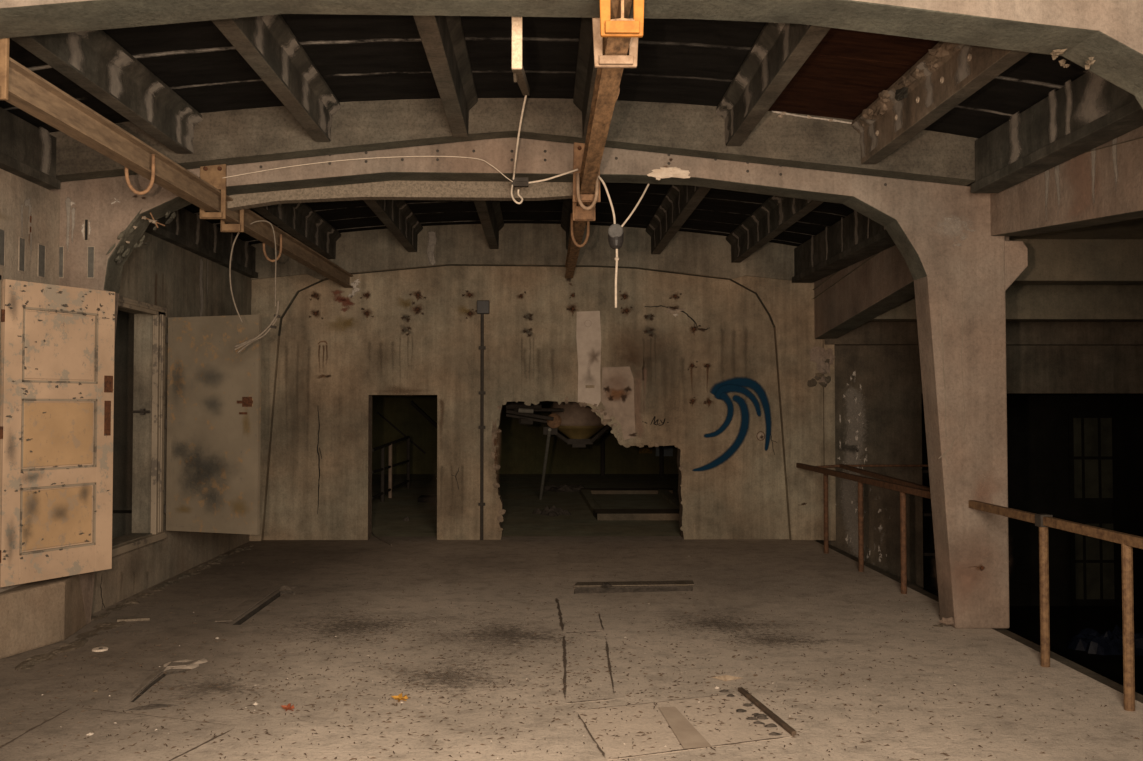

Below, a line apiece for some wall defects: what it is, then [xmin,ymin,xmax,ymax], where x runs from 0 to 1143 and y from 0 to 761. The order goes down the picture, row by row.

spalling [862,42,972,136]
spalling [490,397,539,532]
spalling [558,396,659,448]